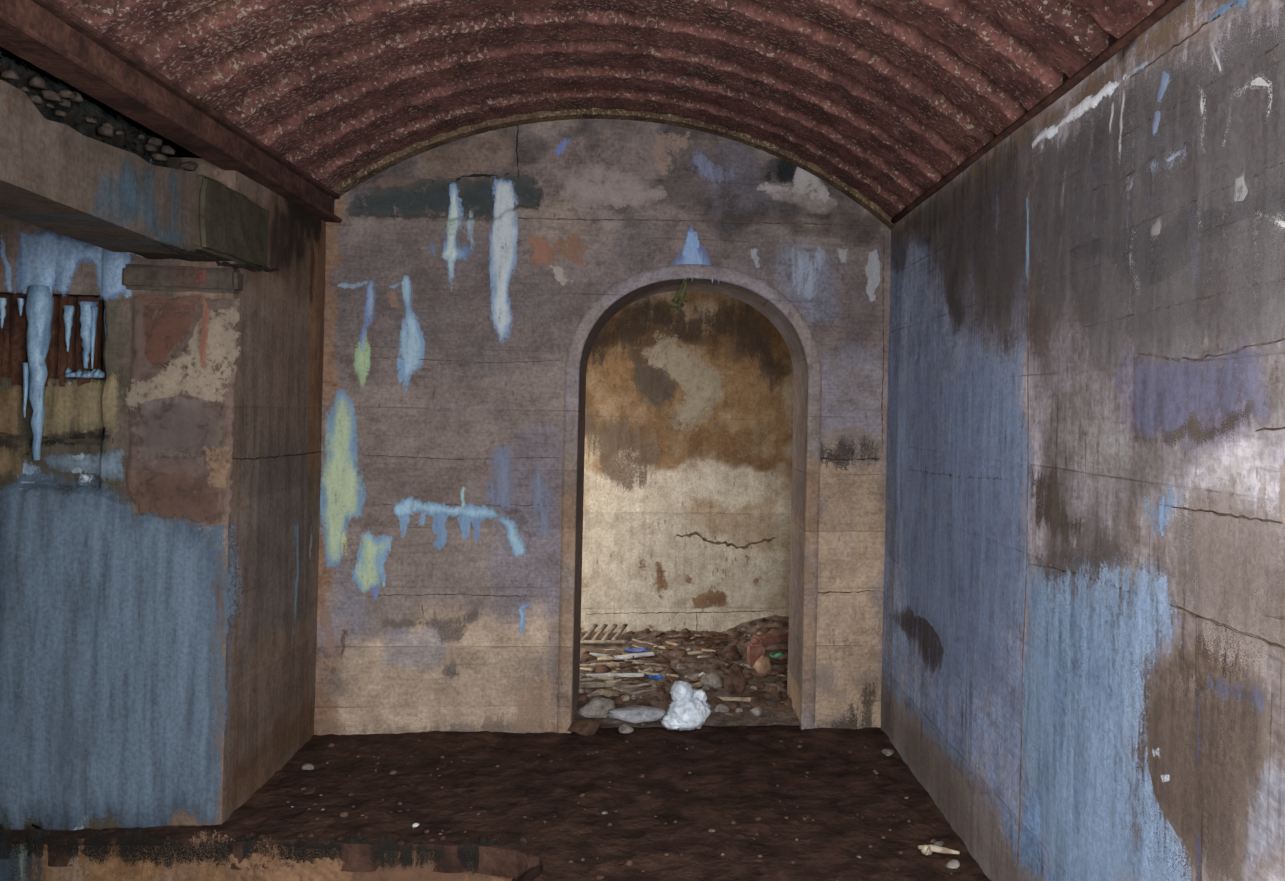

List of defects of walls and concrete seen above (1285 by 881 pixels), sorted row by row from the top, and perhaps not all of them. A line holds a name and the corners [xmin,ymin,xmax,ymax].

spalling [0,51,198,171]
crack [424,125,519,183]
water stain [0,233,36,294]
water stain [784,244,848,300]
water stain [64,366,105,378]
spalling [120,293,242,524]
water stain [584,297,782,491]
crack [515,217,885,460]
water stain [816,0,1285,881]
crack [674,531,776,549]
crack [912,192,1285,877]
crack [594,610,773,627]